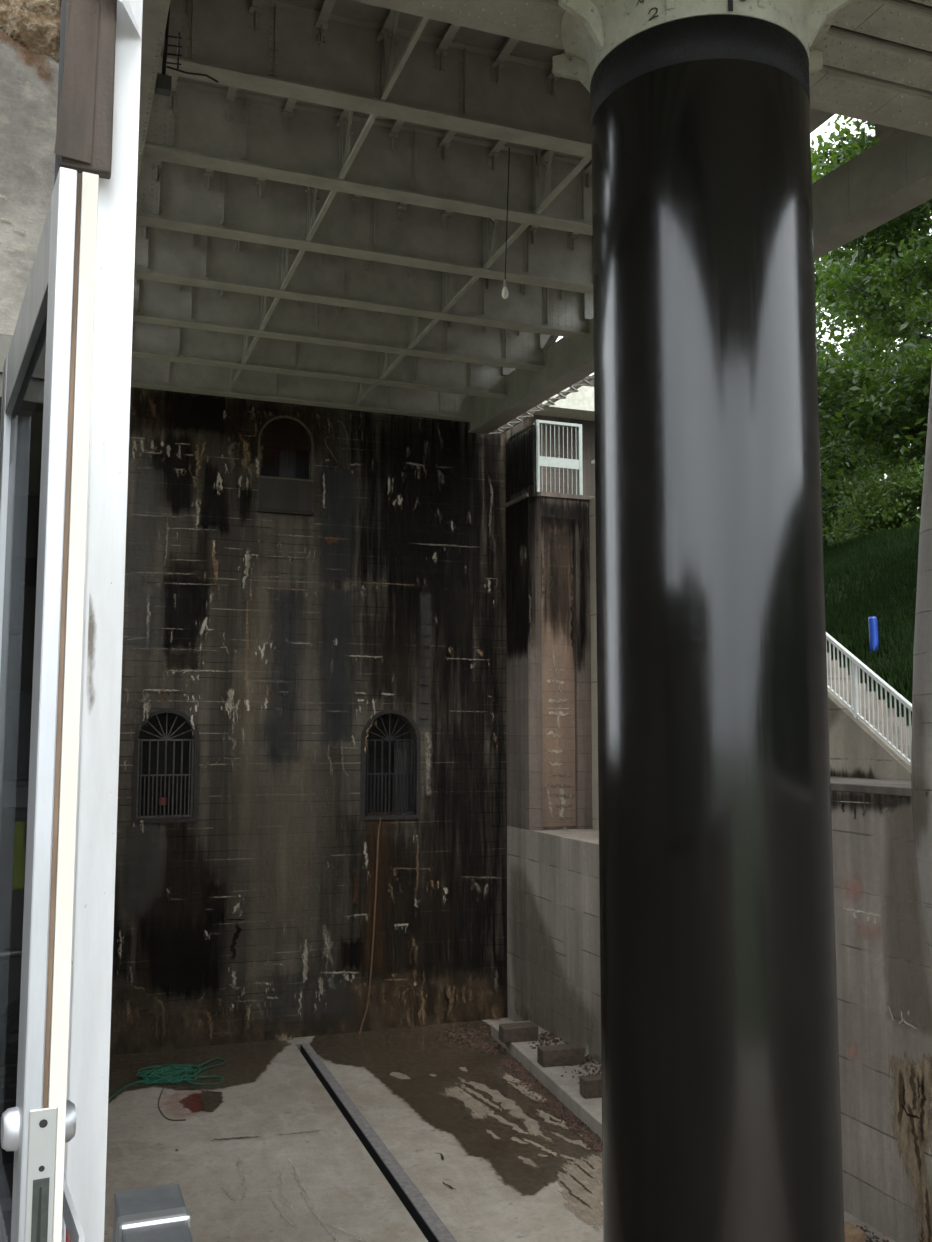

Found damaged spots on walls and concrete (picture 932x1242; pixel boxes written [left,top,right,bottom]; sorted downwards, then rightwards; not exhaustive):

spalling [0,0,62,61]
leakage [108,388,603,1230]